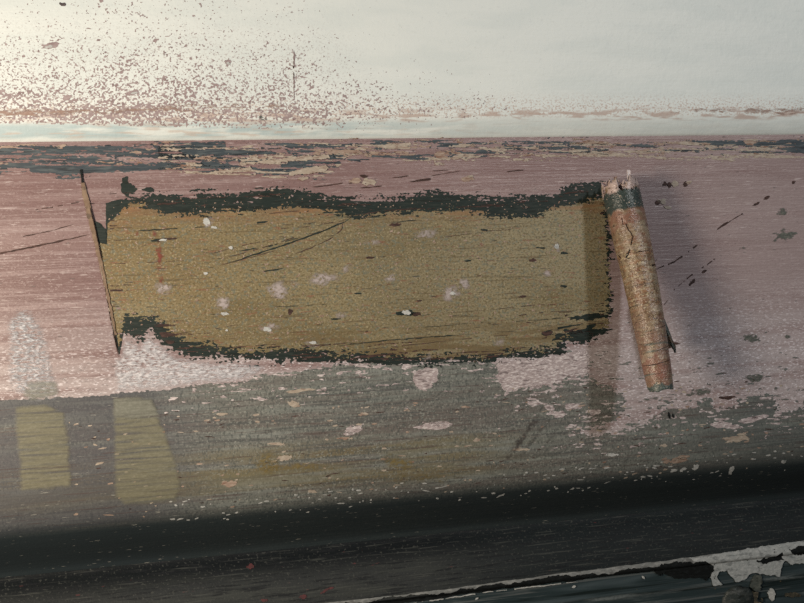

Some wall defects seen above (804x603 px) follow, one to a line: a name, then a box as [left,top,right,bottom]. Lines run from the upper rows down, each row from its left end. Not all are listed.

peeling [349,175,376,186]
peeling [0,136,804,181]
peeling [0,342,804,565]
peeling [654,541,804,586]